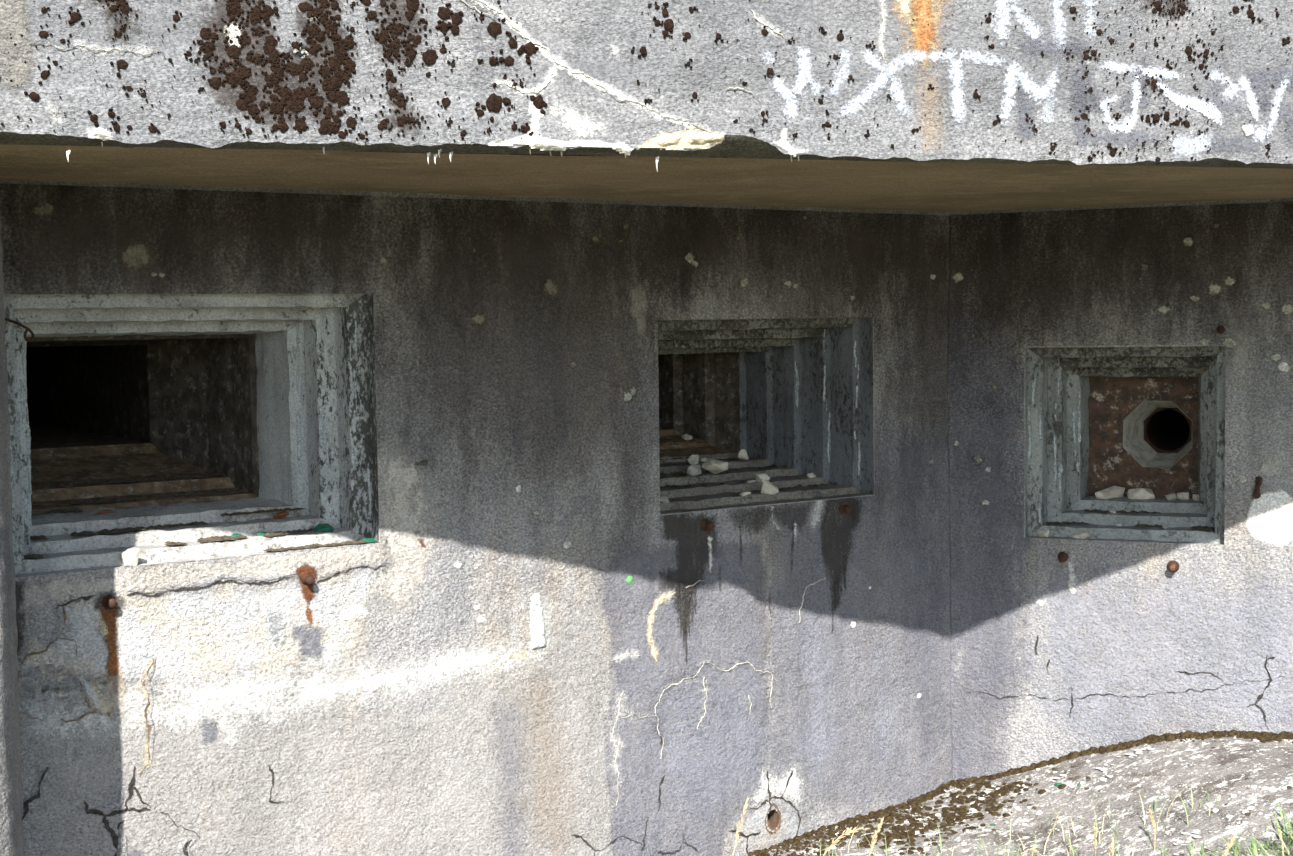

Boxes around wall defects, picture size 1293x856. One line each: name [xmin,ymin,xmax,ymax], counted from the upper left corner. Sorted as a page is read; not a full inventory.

crack [462,0,722,135]
rust [894,0,943,56]
peeling [13,381,32,537]
peeling [348,314,358,416]
damp [1,184,1293,781]
peeling [1028,358,1081,492]
rust [95,592,123,676]
crack [127,561,386,597]
rust [296,565,317,623]
crack [83,658,200,856]
crack [571,580,773,856]
crack [729,767,804,854]